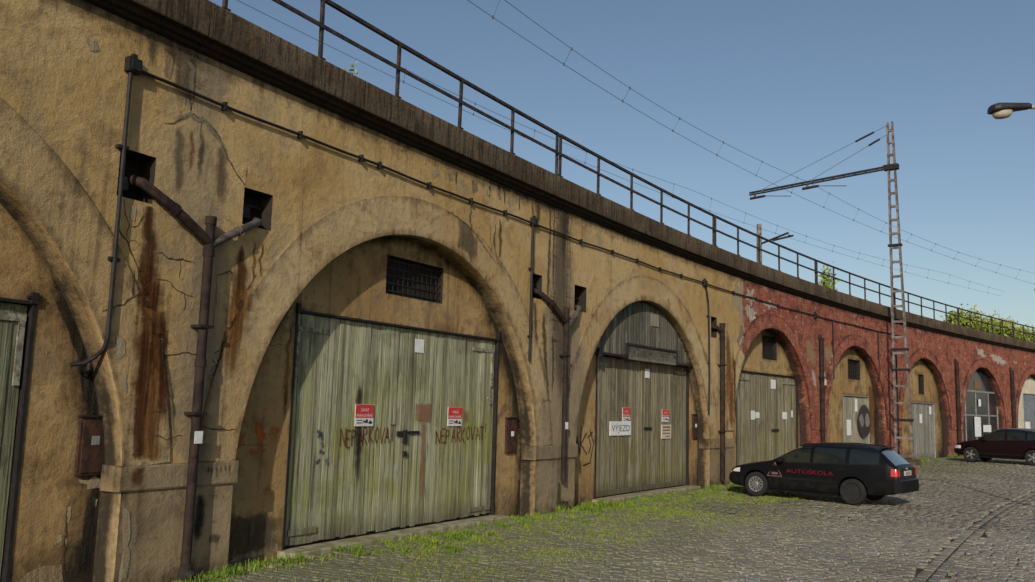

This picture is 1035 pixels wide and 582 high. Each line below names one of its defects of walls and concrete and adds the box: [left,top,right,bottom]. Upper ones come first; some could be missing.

crack [166,2,247,185]
leakage [175,131,204,188]
leakage [217,150,226,196]
corrosion [132,207,167,483]
crack [104,200,268,446]
corrosion [226,244,263,367]
flaking render [732,281,777,350]
leakage [194,496,275,555]